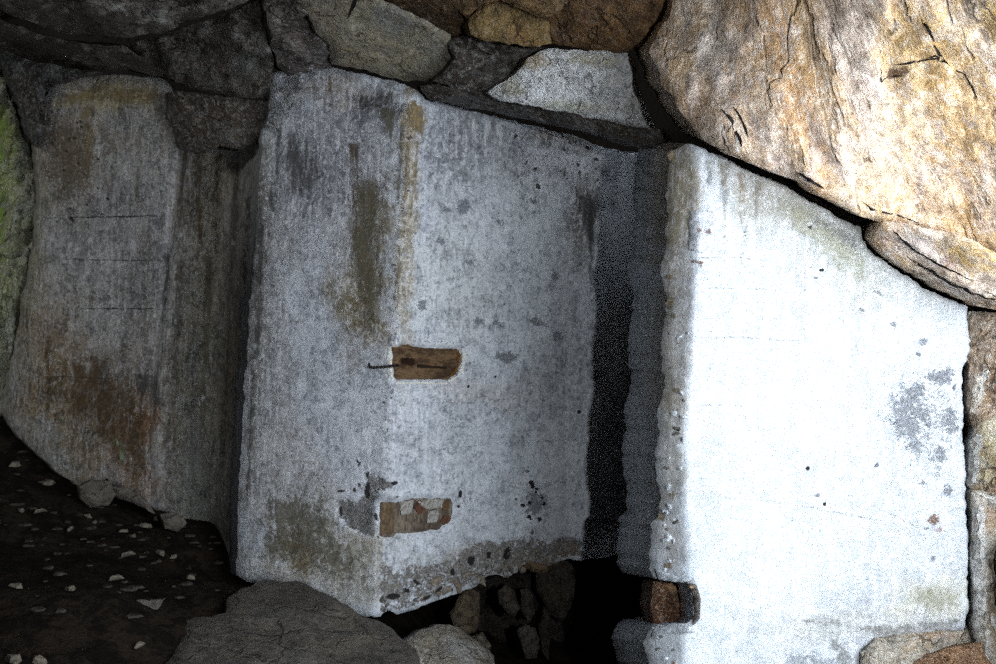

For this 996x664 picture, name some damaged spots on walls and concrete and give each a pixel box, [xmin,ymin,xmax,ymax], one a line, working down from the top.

damp [360,96,395,136]
peeling [443,199,471,215]
damp [349,144,387,325]
peeling [527,317,564,341]
peeling [496,351,517,364]
spalling [664,388,686,471]
spalling [380,470,585,612]
spalling [651,483,701,661]
spalling [787,651,839,664]